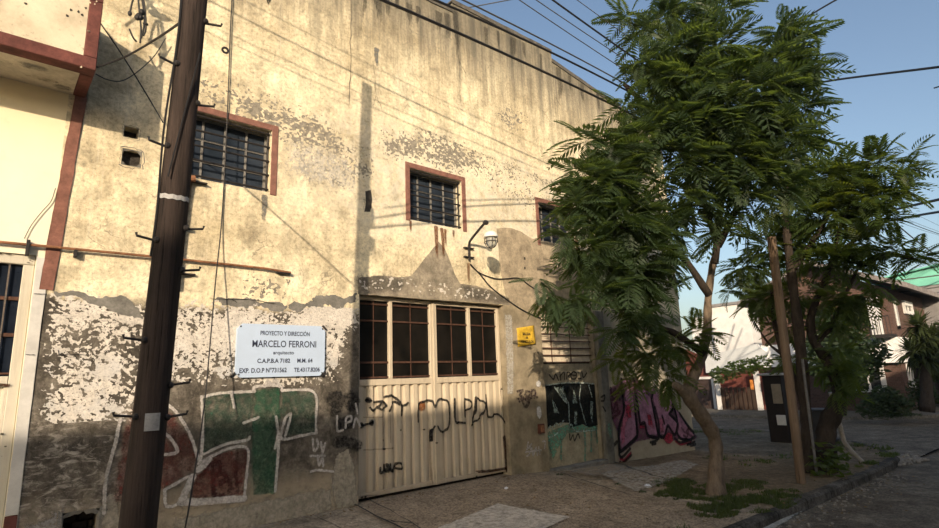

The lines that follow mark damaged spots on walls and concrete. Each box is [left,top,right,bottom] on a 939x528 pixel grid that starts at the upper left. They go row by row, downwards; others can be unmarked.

peeling [199,80,552,212]
damp [495,105,528,136]
rust [434,226,454,256]
peeling [39,290,145,424]
peeling [171,268,505,387]